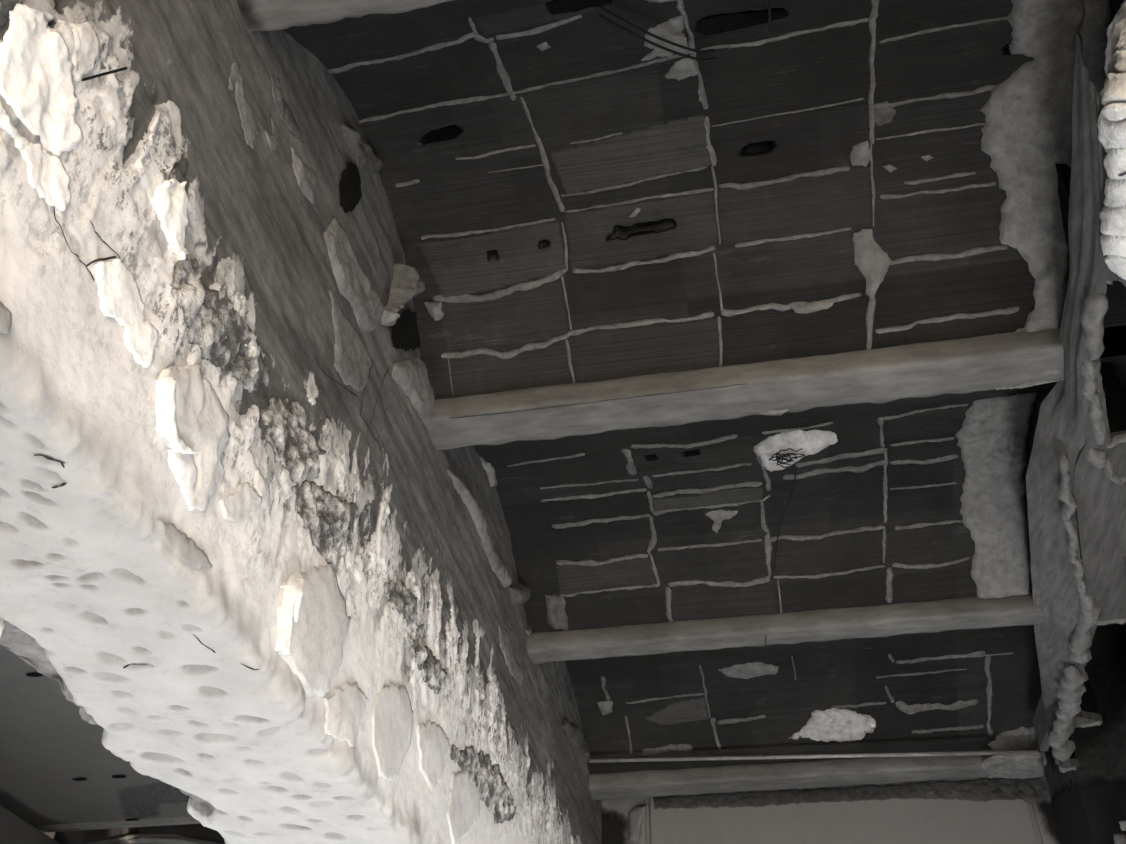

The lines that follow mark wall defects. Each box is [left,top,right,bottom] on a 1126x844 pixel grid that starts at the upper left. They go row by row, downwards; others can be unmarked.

flaking render [0,0,100,211]
spalling [0,301,12,334]
spalling [94,178,518,844]